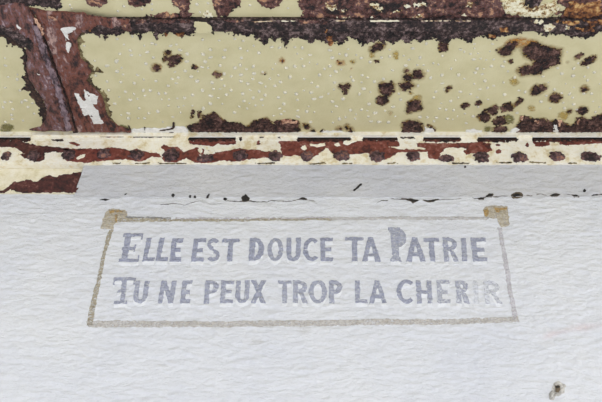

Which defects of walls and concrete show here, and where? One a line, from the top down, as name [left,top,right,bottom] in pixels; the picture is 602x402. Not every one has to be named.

corrosion [297,0,602,46]
peeling [531,19,556,32]
corrosion [495,38,562,84]
corrosion [530,84,563,103]
corrosion [362,69,460,143]
corrosion [460,97,602,143]
peeling [0,126,271,163]
peeling [278,140,501,160]
peeling [0,172,82,193]
crack [161,194,317,205]
crack [377,193,500,203]
crack [526,191,602,199]